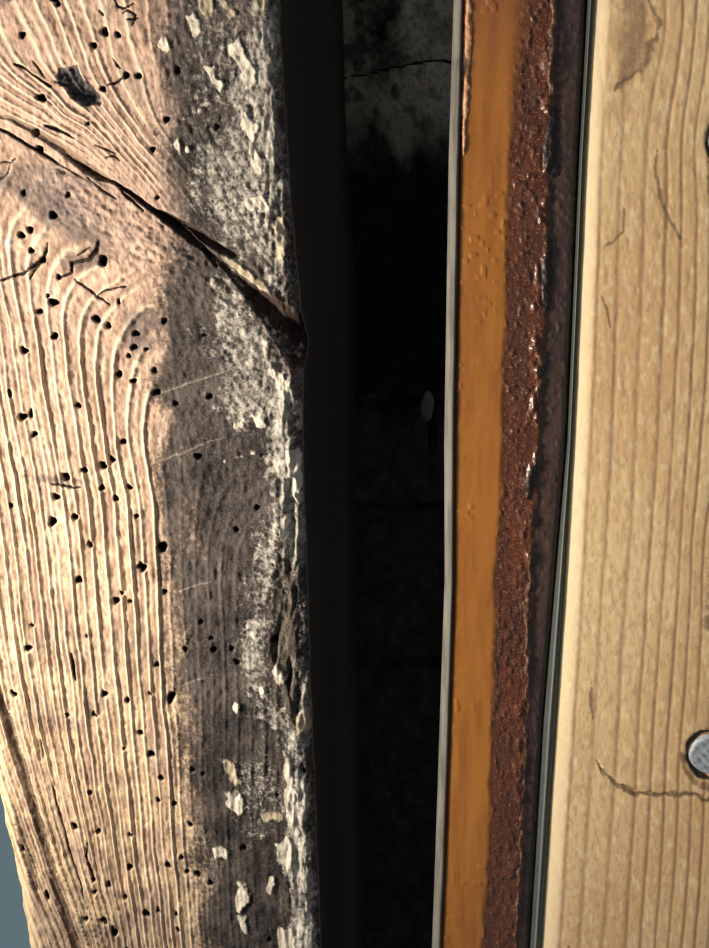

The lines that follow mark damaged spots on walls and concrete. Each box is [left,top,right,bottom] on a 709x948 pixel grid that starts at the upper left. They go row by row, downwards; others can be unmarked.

peeling [158,35,170,52]
crack [345,59,452,79]
crack [0,115,308,366]
damp [121,313,154,353]
spalling [174,0,320,948]